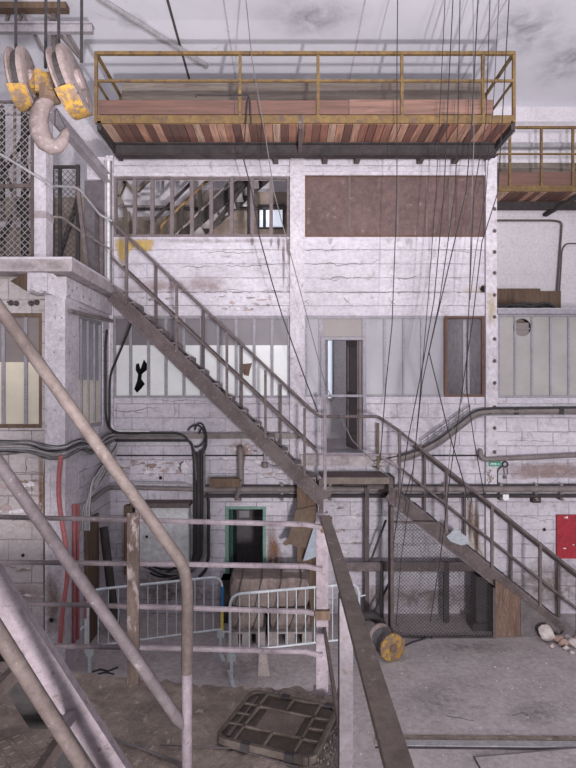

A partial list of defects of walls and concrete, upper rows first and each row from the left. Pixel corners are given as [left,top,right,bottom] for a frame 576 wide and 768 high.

crack [167,244,478,305]
spalling [121,460,185,480]